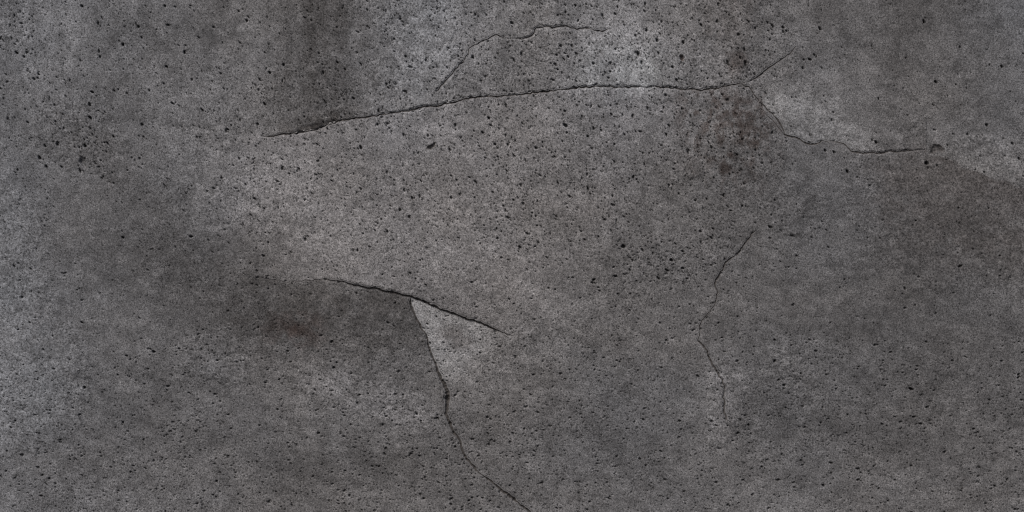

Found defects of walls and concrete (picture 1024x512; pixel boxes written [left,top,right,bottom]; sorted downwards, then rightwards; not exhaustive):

crack [261,24,920,155]
crack [257,276,532,512]
crack [696,230,757,421]